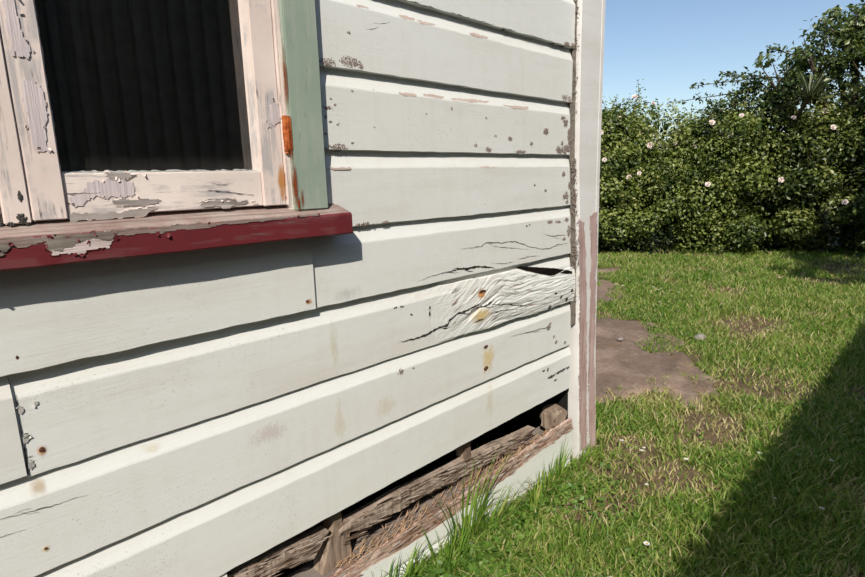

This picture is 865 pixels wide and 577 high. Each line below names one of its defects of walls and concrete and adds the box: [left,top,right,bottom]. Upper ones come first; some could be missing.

peeling [20,77,52,153]
peeling [398,92,489,103]
corrosion [278,129,304,209]
peeling [0,170,320,257]
crack [420,234,567,281]
crack [401,299,527,342]
peeling [578,212,598,451]
crack [2,495,86,537]